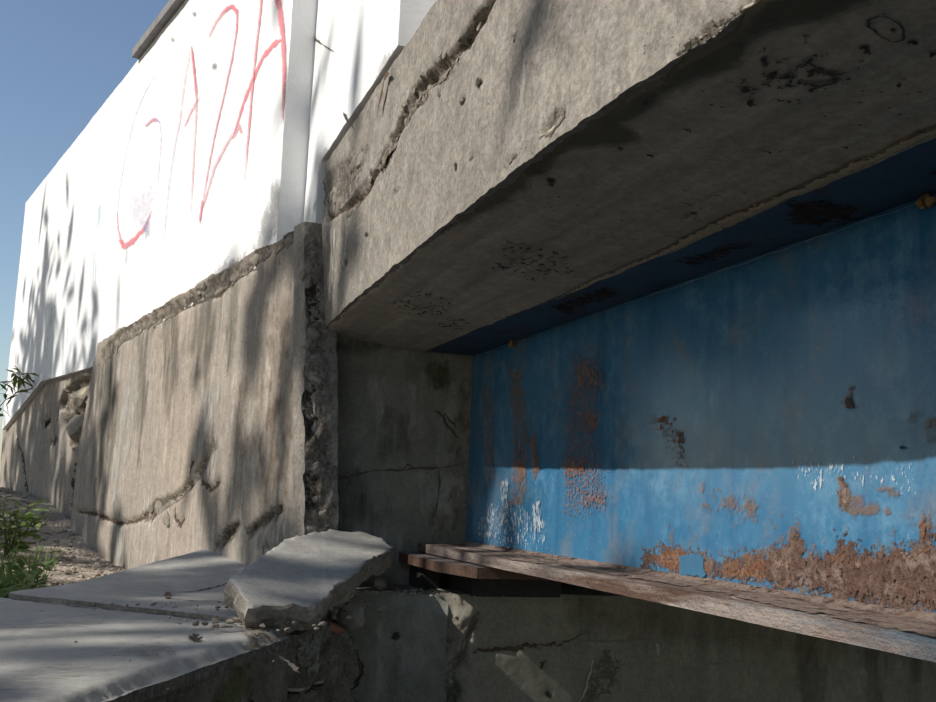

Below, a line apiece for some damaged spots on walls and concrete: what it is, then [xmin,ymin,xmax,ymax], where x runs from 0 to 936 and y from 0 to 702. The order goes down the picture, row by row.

spalling [314,147,369,223]
spalling [378,135,397,173]
crack [330,1,496,221]
spalling [102,231,294,366]
crack [17,407,65,492]
crack [70,444,221,528]
spalling [299,235,337,535]
rust [508,360,539,506]
rust [558,336,614,529]
rust [837,476,890,515]
rust [498,515,936,637]
crack [472,630,786,654]